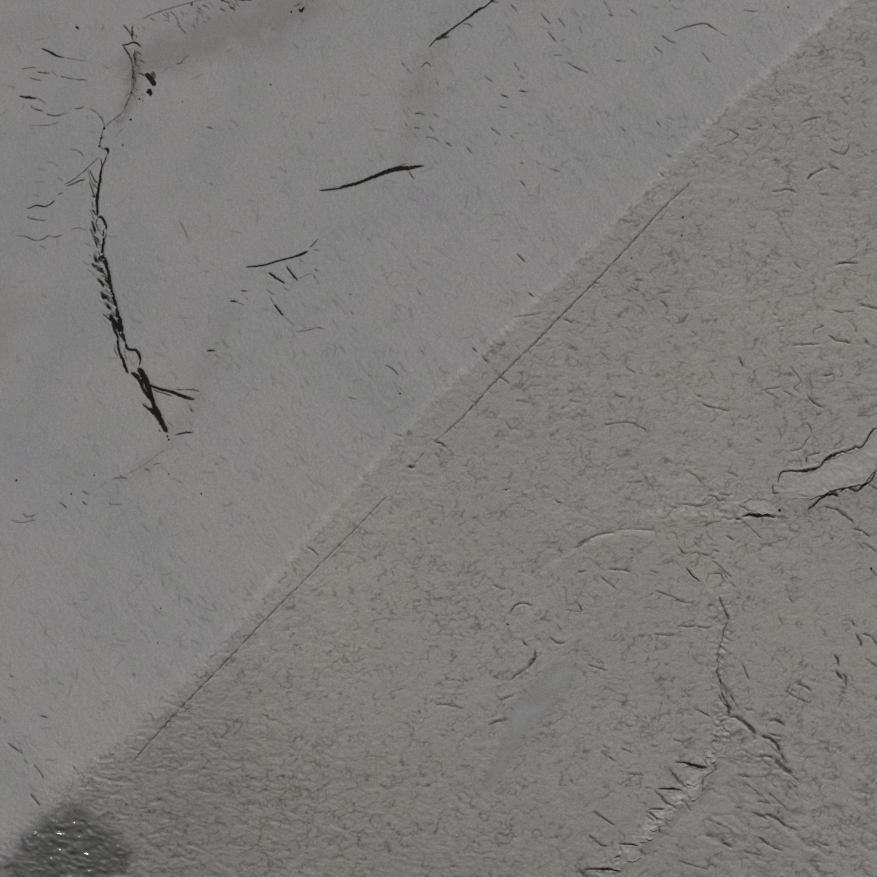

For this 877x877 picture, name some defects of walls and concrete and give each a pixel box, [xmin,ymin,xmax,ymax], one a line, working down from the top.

crack [123,26,156,120]
crack [424,0,493,64]
crack [321,165,423,191]
crack [68,118,195,440]
crack [247,241,316,283]
crack [737,428,877,536]
crack [727,702,788,772]
crack [587,748,726,877]